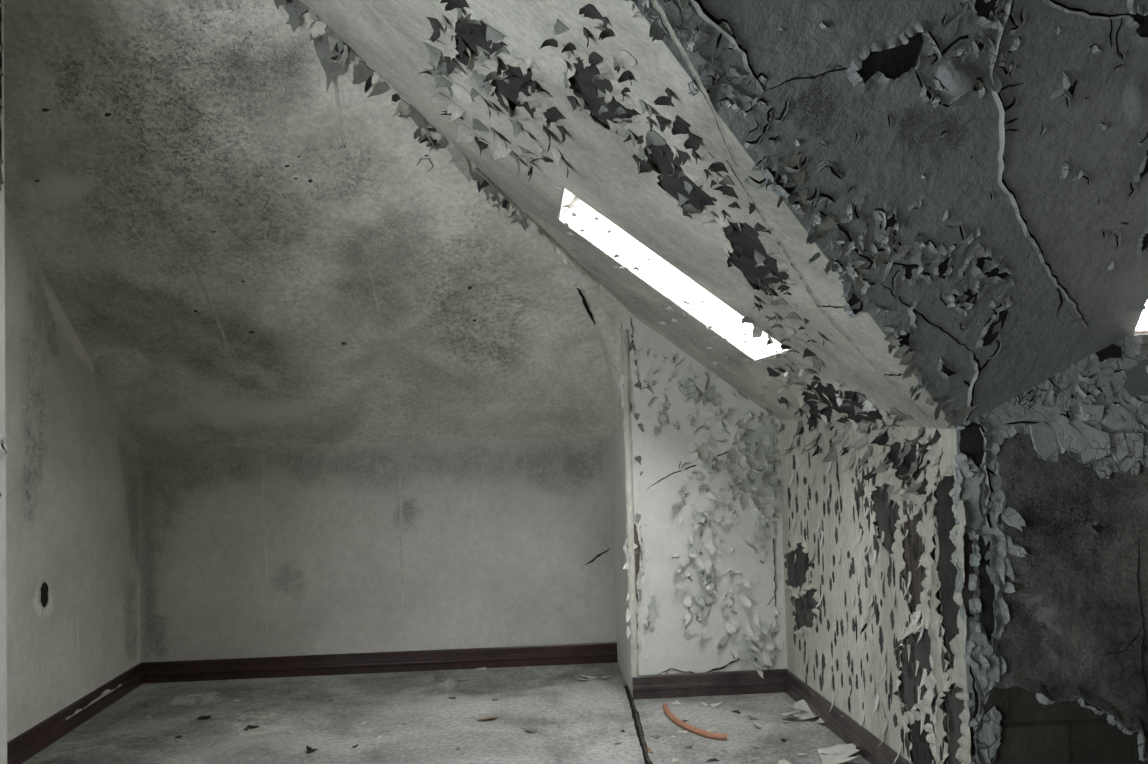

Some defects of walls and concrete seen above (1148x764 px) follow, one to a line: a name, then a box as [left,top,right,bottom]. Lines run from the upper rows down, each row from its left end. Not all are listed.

water stain [7,0,539,544]
crack [577,286,597,325]
crack [631,318,685,408]
spalling [274,0,1148,764]
crack [642,0,1148,543]
water stain [32,583,54,618]
water stain [118,436,613,664]
crack [645,377,781,675]
water stain [990,473,1148,680]